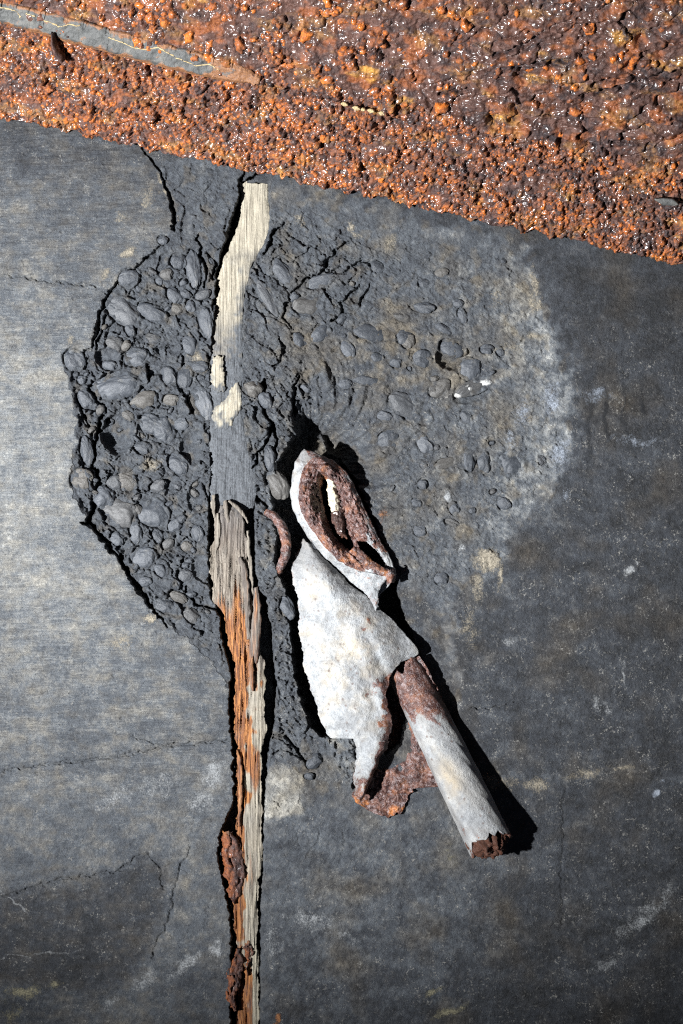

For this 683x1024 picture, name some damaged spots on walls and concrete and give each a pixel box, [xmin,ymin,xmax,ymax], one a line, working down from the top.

corrosion [0,0,683,265]
crack [0,241,372,960]
spalling [65,158,579,797]
corrosion [298,458,387,574]